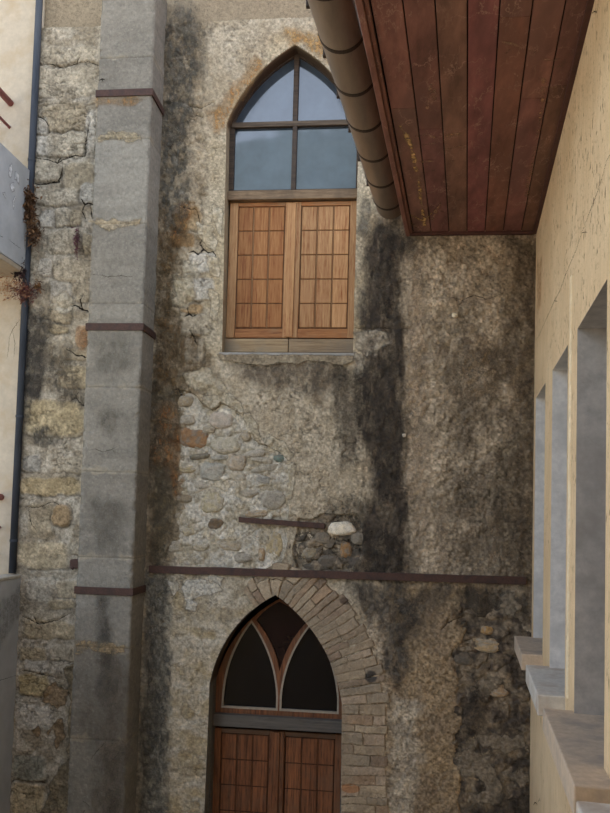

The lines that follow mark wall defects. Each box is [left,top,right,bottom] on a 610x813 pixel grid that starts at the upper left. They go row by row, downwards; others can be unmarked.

flaking render [168,391,363,612]
water stain [243,199,503,687]
flaking render [449,592,531,813]
water stain [453,239,541,582]
water stain [514,594,532,627]